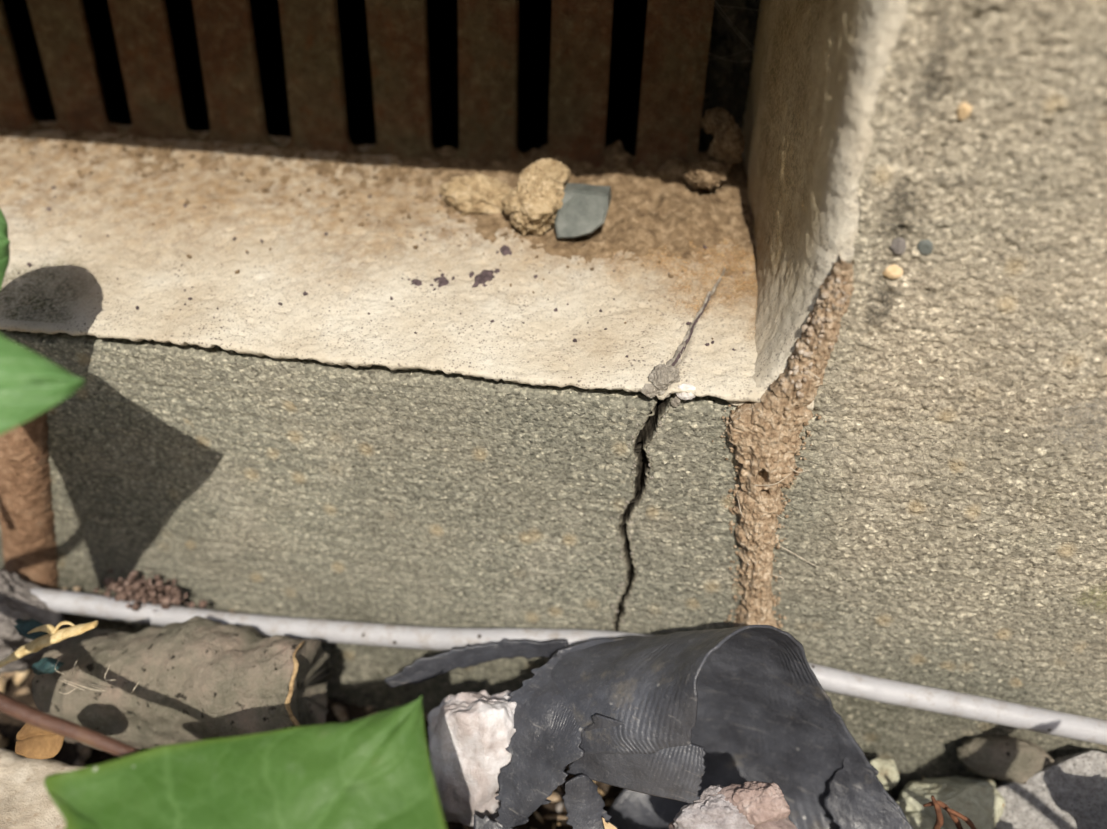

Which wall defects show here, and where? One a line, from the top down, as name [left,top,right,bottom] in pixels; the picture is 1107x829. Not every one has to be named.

crack [666,267,725,367]
crack [607,394,673,632]